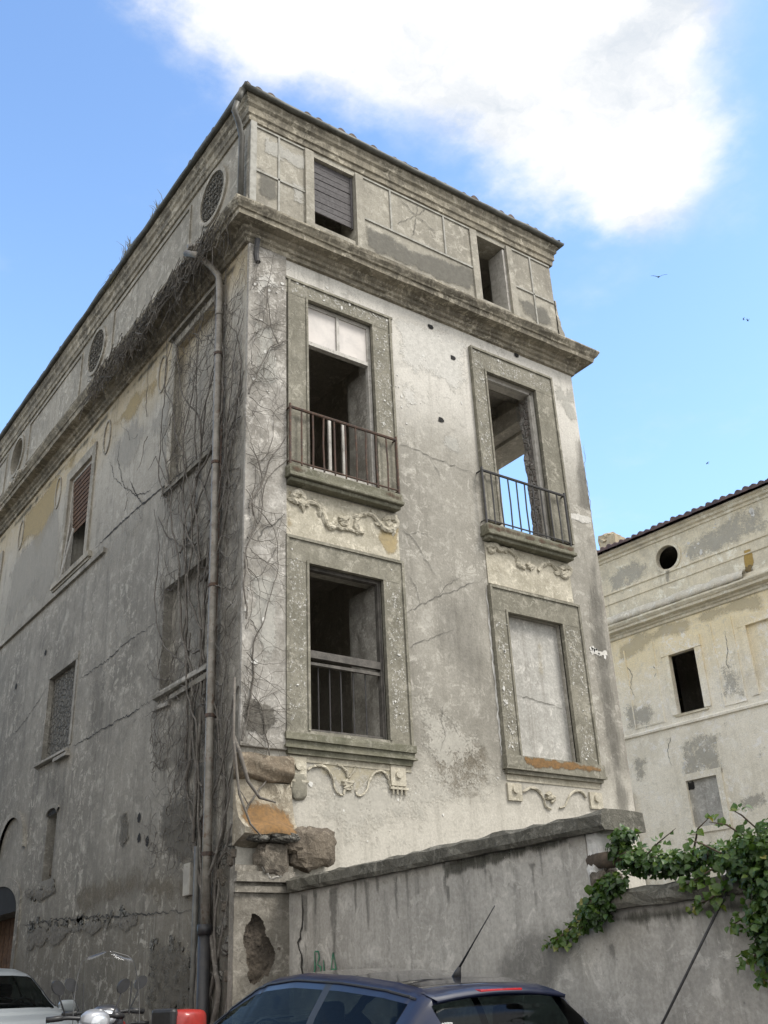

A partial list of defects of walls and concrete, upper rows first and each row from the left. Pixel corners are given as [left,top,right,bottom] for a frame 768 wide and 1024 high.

damp [367,228,474,288]
crack [404,531,483,612]
peeling [243,696,498,880]
corrosion [525,757,601,772]
peeling [682,735,723,790]
damp [445,838,566,875]
crack [25,909,191,926]
flaking render [243,914,281,985]
crack [296,894,304,974]